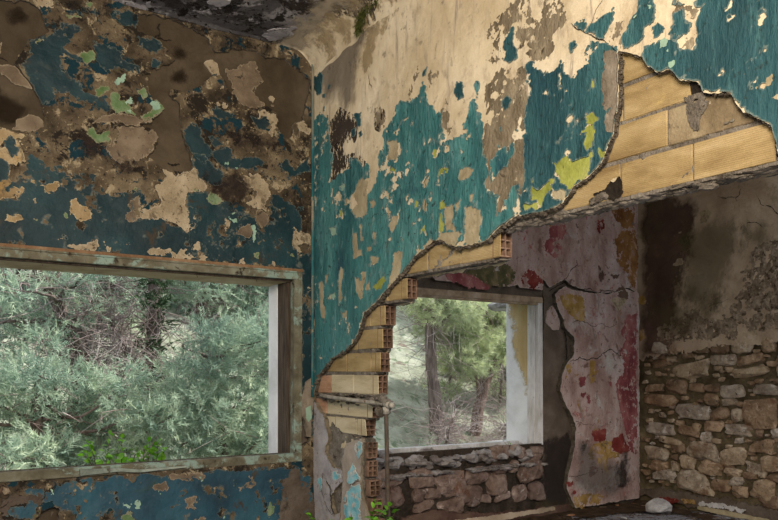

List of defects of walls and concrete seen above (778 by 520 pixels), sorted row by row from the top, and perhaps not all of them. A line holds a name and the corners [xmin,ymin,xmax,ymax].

peeling [0,0,311,298]
peeling [278,0,778,520]
crack [550,265,623,311]
peeling [0,466,322,520]